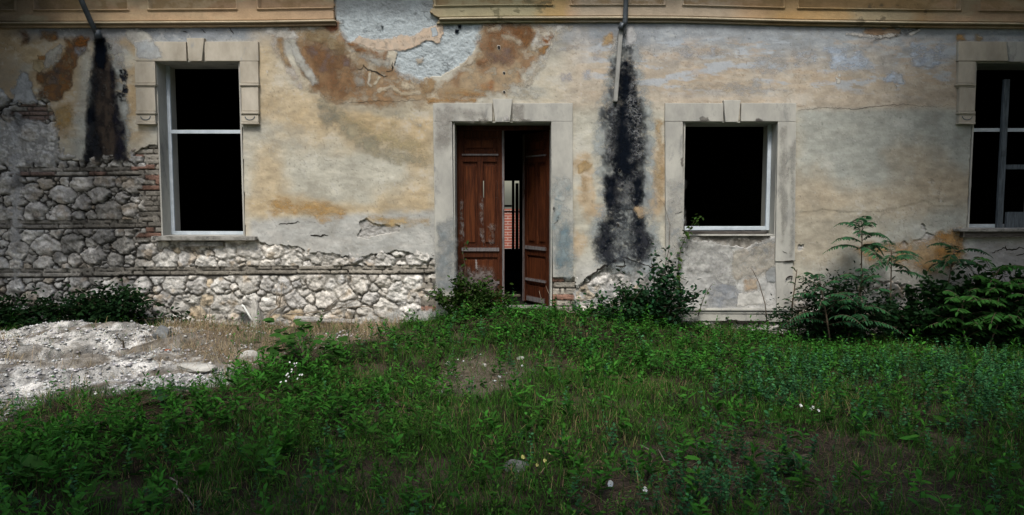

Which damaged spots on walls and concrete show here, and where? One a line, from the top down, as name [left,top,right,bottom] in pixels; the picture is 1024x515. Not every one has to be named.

water stain [84,28,161,162]
flaking render [336,0,578,98]
spalling [357,218,400,239]
water stain [591,26,684,305]